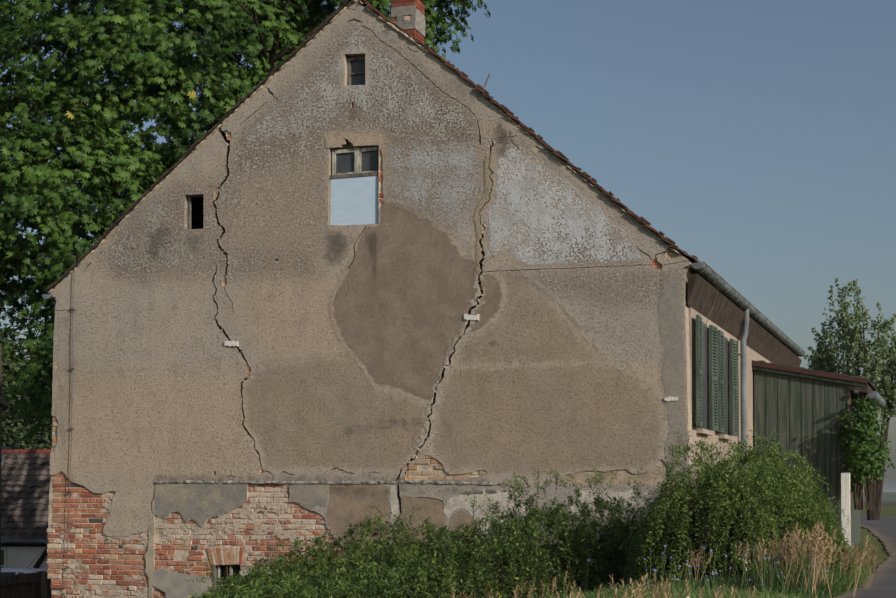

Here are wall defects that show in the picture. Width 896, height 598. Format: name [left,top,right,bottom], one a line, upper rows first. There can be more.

crack [208,87,295,478]
crack [331,6,666,548]
spalling [47,468,347,598]
peeling [381,485,399,563]
spalling [401,454,488,481]
peeling [443,489,531,538]